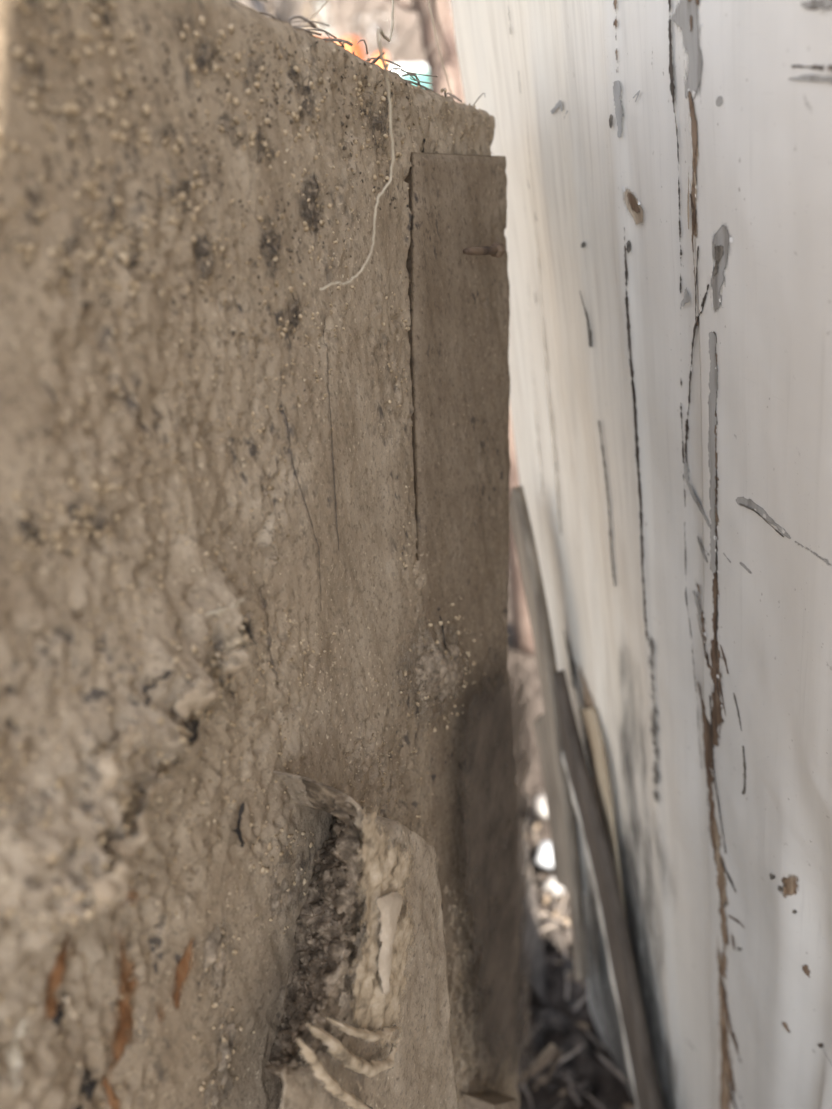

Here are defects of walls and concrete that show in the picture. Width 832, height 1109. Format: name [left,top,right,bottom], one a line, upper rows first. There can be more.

peeling [671,0,703,100]
peeling [622,186,643,224]
peeling [711,225,734,311]
peeling [693,584,744,1109]